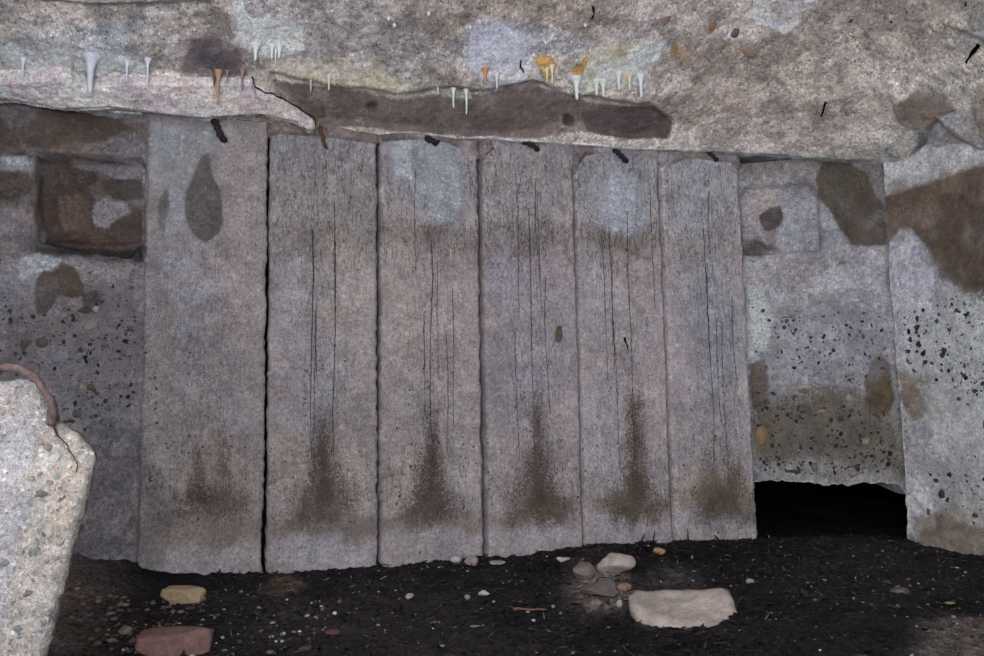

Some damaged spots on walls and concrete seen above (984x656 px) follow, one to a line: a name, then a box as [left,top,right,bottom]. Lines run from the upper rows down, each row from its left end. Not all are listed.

leakage [0,42,152,94]
leakage [184,39,241,77]
crack [252,76,316,125]
leakage [233,0,671,221]
leakage [0,110,144,313]
leakage [148,126,222,242]
leakage [817,161,984,437]
leakage [289,418,356,522]
leakage [396,406,468,528]
leakage [507,393,574,528]
leakage [604,390,671,529]